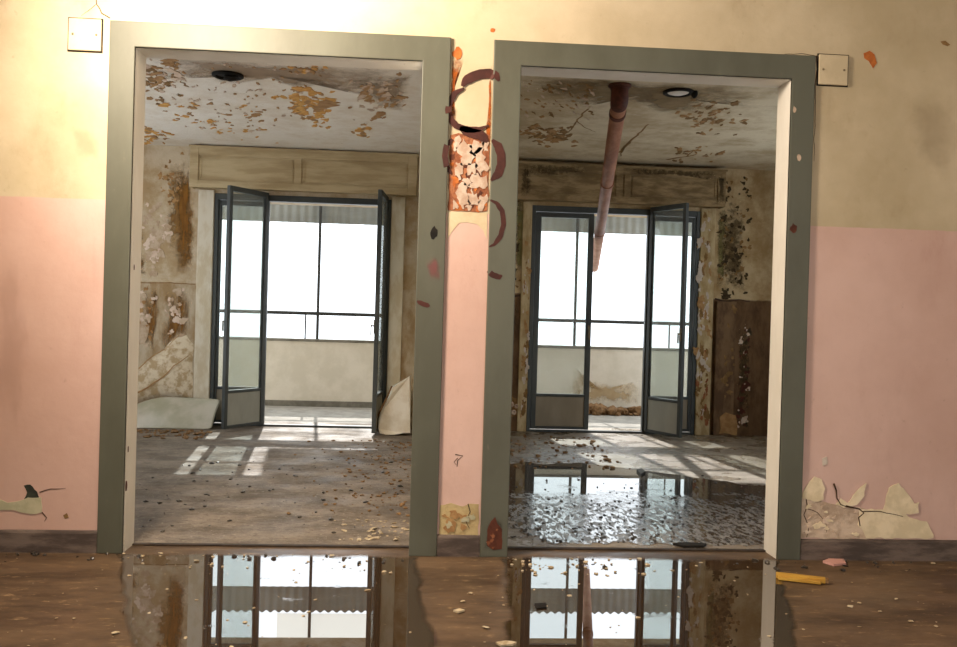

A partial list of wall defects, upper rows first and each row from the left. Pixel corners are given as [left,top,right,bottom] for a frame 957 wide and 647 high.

peeling [144,126,175,145]
peeling [145,59,409,140]
peeling [519,80,595,148]
peeling [672,98,749,164]
peeling [447,133,490,239]
peeling [139,152,189,347]
water stain [634,169,752,300]
peeling [0,485,65,520]
spalling [439,503,479,535]
rust [486,518,502,550]
crack [804,483,903,537]
peeling [801,477,934,539]